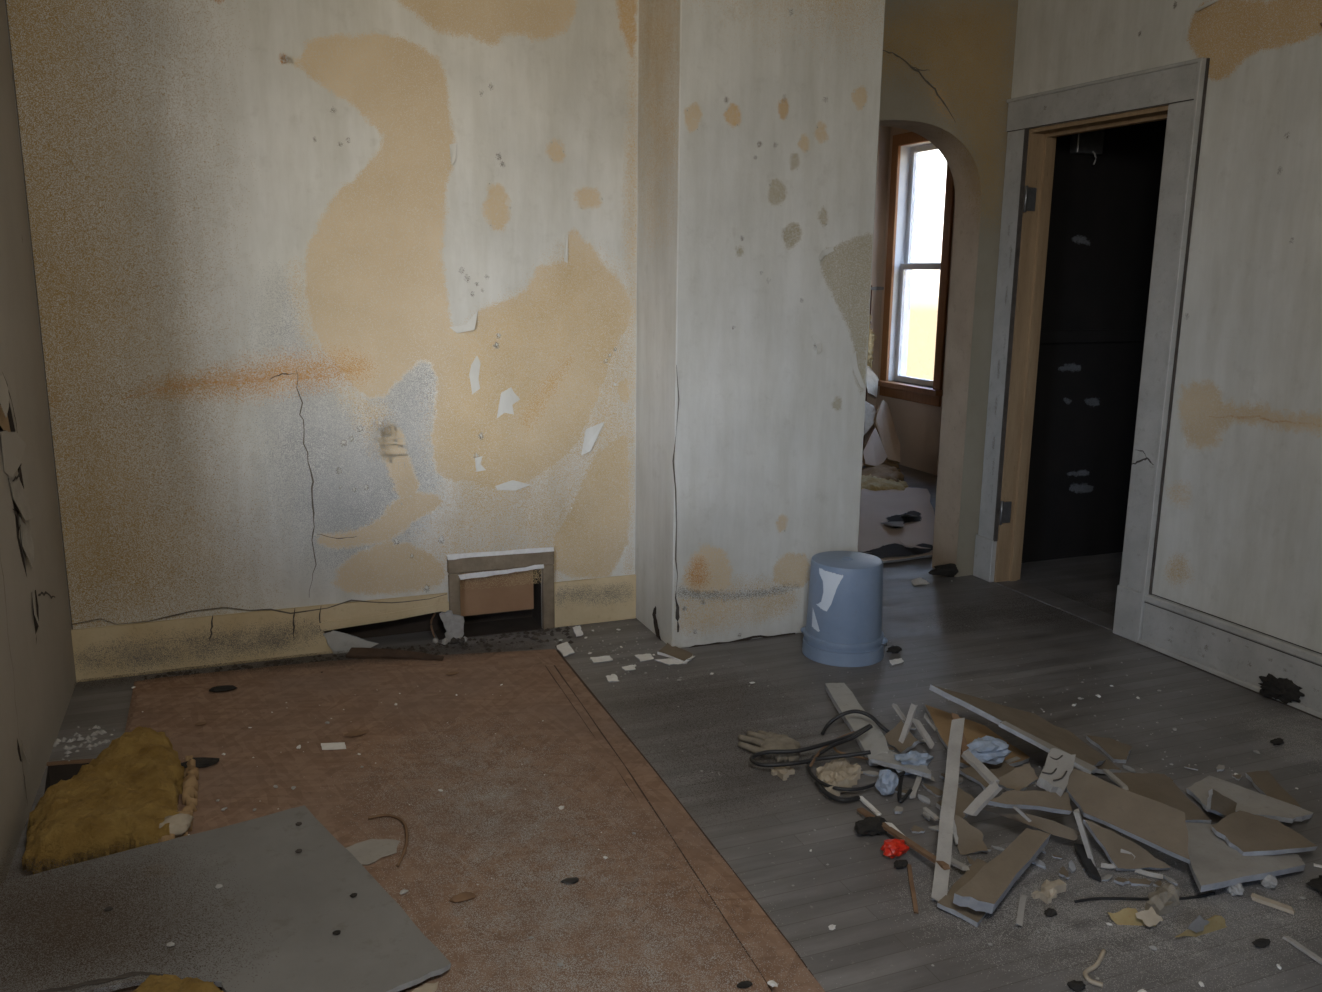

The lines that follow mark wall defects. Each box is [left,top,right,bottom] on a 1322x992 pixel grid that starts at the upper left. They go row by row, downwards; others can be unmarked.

crack [883,50,956,123]
crack [5,0,446,641]
leakage [6,0,1017,691]
peeling [818,231,884,394]
spalling [0,374,34,568]
peeling [340,421,420,505]